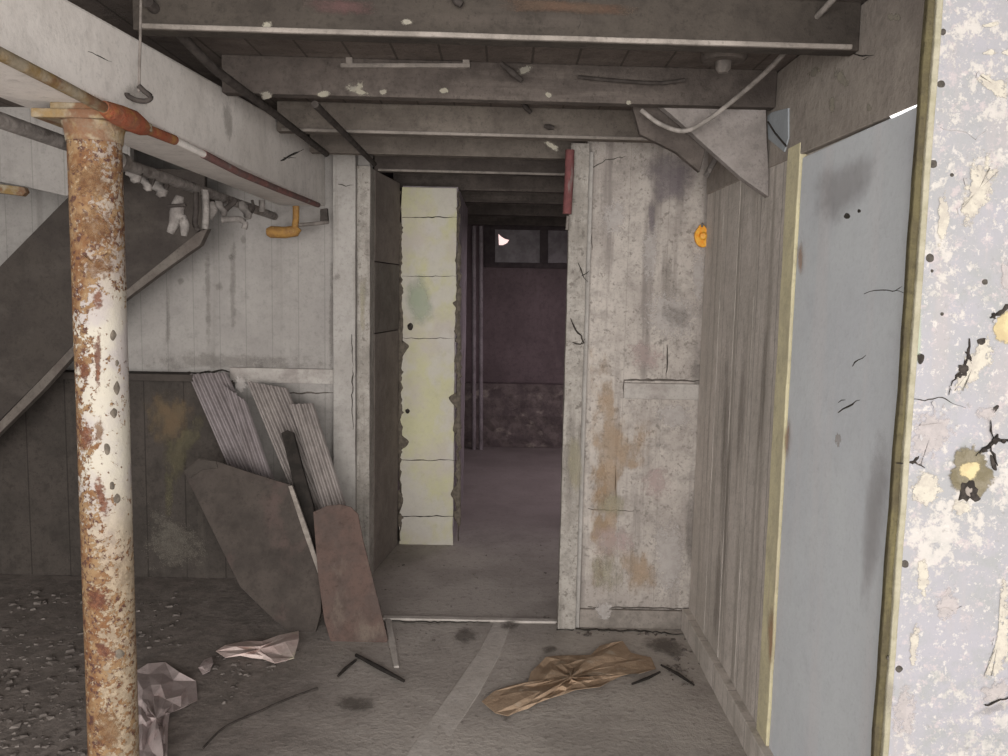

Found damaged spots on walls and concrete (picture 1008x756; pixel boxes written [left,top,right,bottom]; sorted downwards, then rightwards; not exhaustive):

corrosion [74,163,116,279]
corrosion [79,336,101,393]
spalling [398,191,409,541]
spalling [449,191,462,541]
crack [570,318,585,345]
peeling [950,311,1008,391]
corrosion [79,421,103,449]
corrosion [95,477,108,516]
spalling [911,446,997,515]
corrosion [96,643,116,659]
peeling [984,579,1008,677]